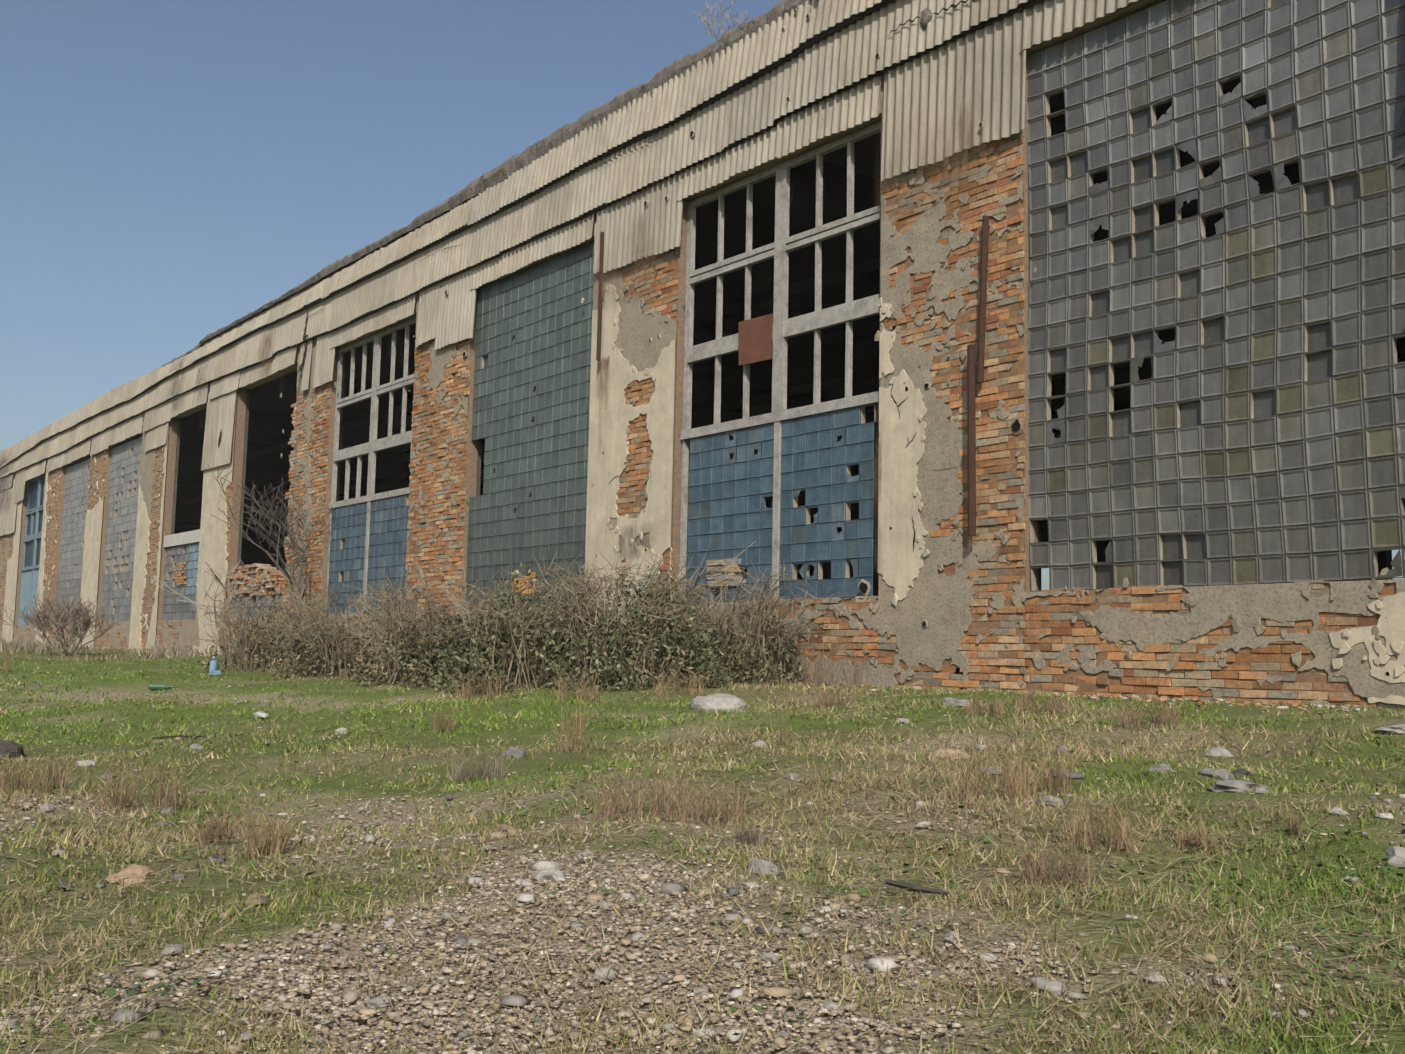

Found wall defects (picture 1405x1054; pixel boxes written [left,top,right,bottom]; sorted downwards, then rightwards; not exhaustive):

flaking render [581,247,686,625]
rust [738,313,773,365]
flaking render [740,129,1405,708]